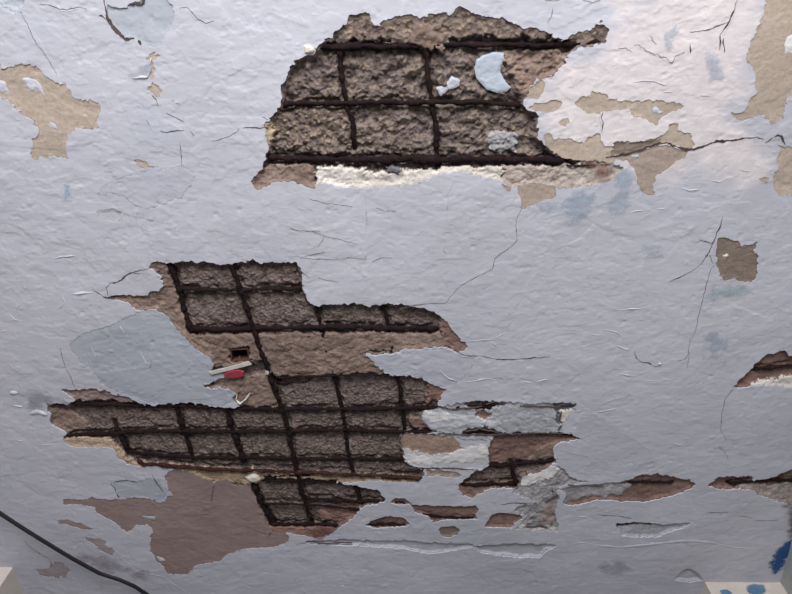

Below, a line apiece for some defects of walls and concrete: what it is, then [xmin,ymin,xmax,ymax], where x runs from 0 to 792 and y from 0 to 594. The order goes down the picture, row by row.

peeling [0,63,101,160]
peeling [107,0,175,97]
spalling [251,6,695,209]
crack [620,1,738,64]
crack [608,134,786,157]
peeling [731,0,792,125]
crack [400,208,522,309]
crack [672,217,724,366]
peeling [716,237,758,282]
spalling [47,259,695,575]
spalling [733,350,792,388]
spalling [708,469,792,505]